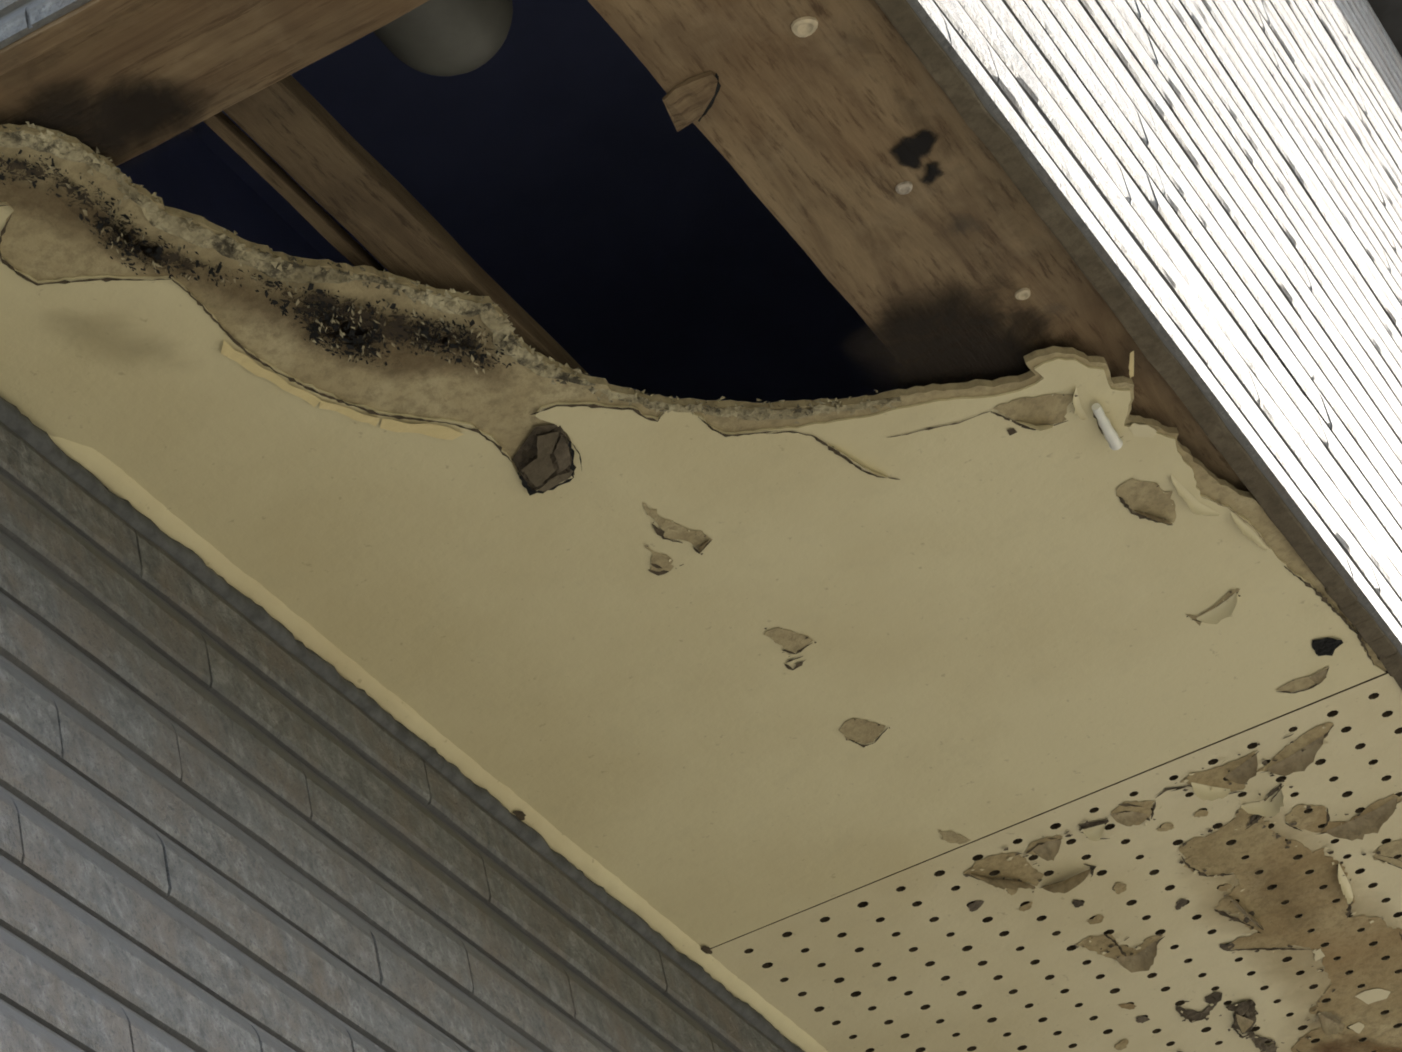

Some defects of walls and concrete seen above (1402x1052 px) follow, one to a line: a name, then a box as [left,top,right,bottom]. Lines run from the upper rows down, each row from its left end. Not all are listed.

water stain [891,131,943,185]
water stain [0,149,512,371]
water stain [860,289,1040,389]
peeling [221,340,464,440]
peeling [991,388,1088,431]
spalling [512,424,582,496]
peeling [642,503,713,576]
peeling [1116,475,1269,550]
peeling [764,627,817,670]
peeling [1284,566,1374,665]
peeling [839,718,890,748]
peeling [963,722,1402,1052]